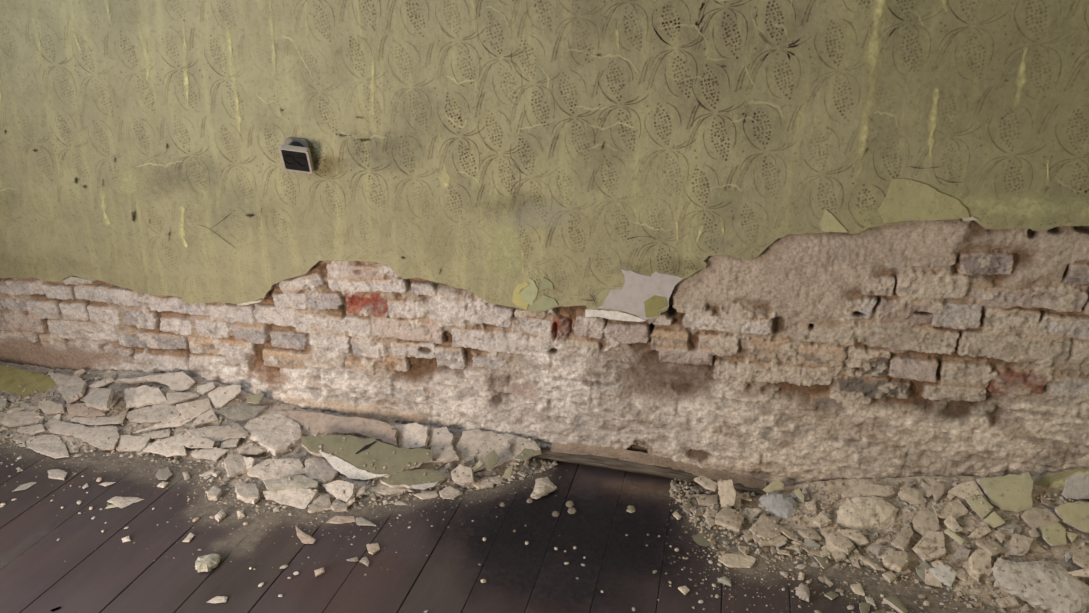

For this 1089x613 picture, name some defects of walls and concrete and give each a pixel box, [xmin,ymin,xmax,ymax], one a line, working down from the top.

spalling [0,178,1089,487]